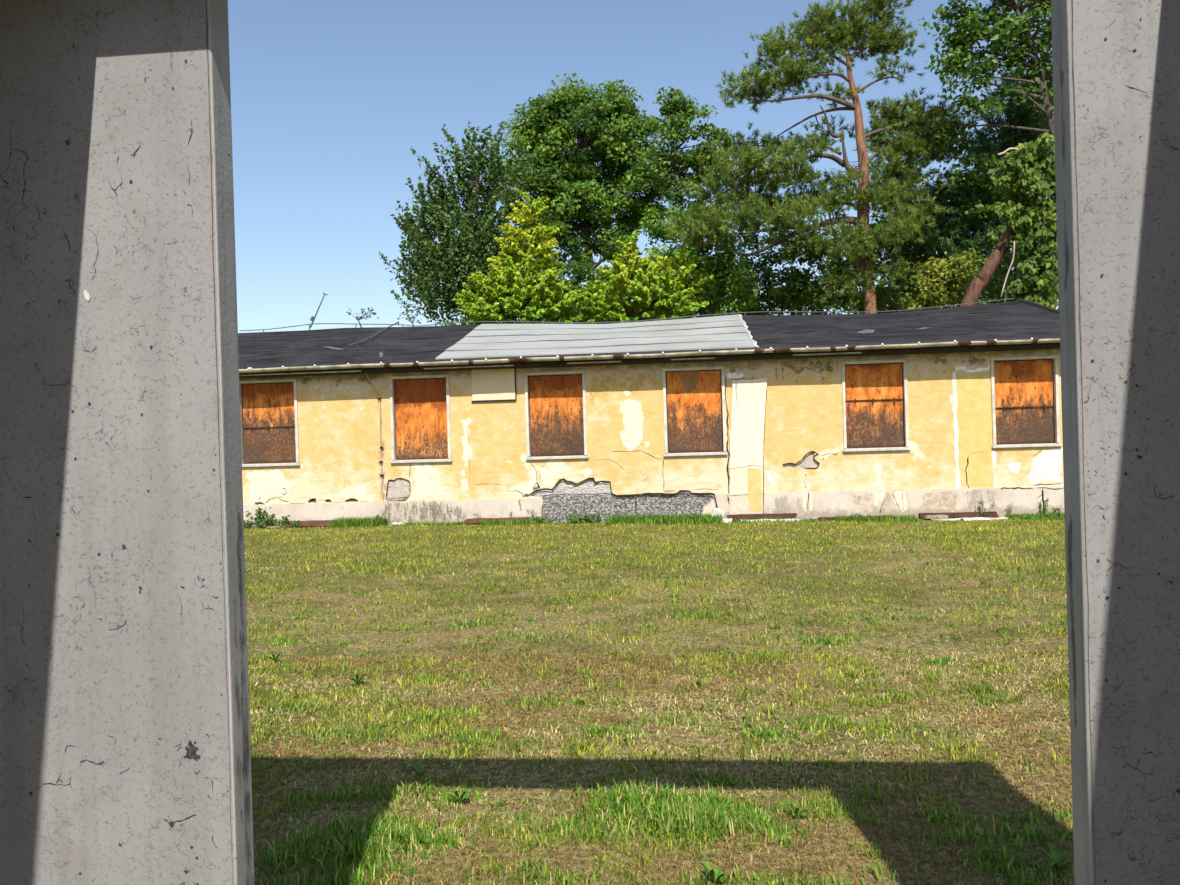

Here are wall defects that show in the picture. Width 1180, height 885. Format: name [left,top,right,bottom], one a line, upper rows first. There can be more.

peeling [618,391,650,453]
peeling [244,417,473,505]
spalling [505,454,718,523]
spalling [767,451,820,487]